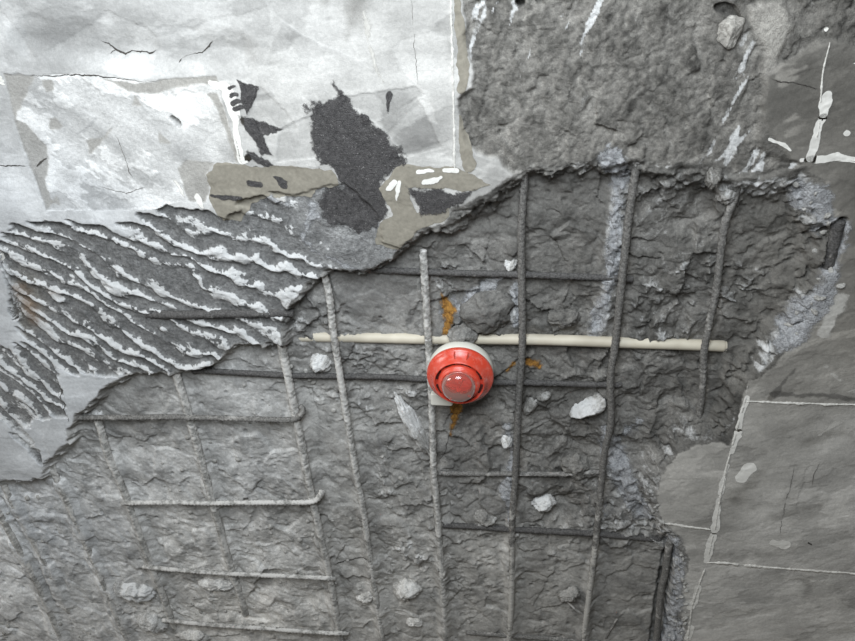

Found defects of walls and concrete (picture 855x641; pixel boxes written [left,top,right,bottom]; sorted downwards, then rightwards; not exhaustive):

crack [103,41,156,55]
spalling [717,15,745,50]
corrosion [441,294,457,335]
spalling [0,155,849,641]
corrosion [450,403,462,436]
crack [780,463,820,532]